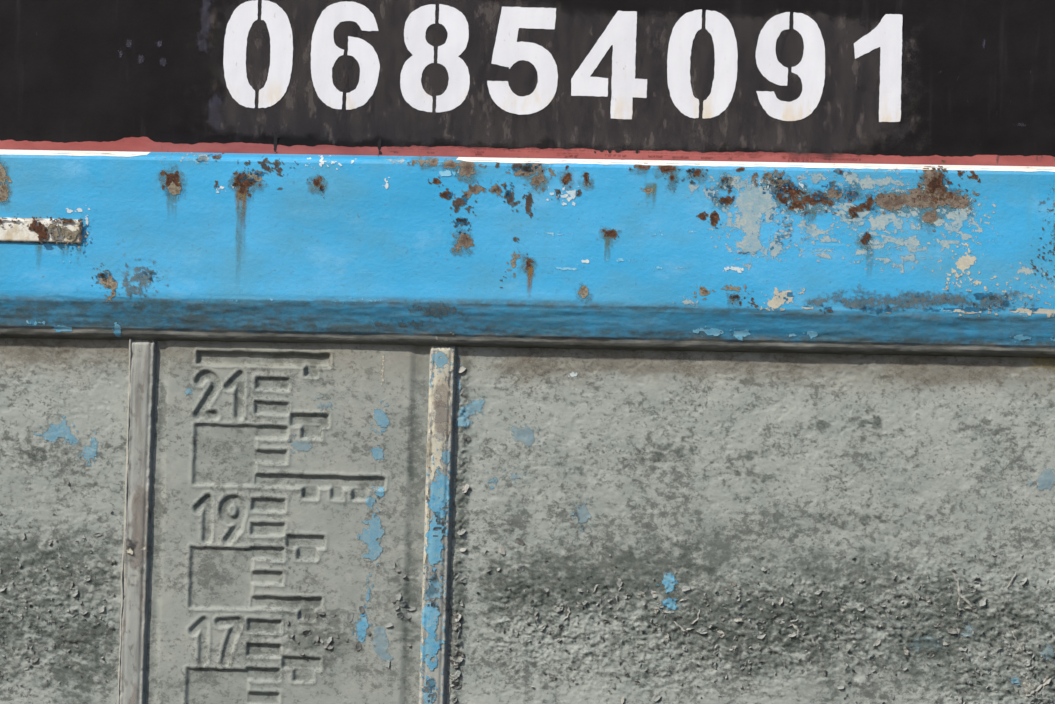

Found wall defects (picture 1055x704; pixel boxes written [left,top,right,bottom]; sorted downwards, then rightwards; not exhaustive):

corrosion [0,214,87,251]
corrosion [159,170,183,195]
corrosion [216,155,354,209]
corrosion [407,156,593,255]
corrosion [500,237,535,288]
corrosion [601,229,619,248]
corrosion [628,163,708,194]
corrosion [696,160,980,231]
peeling [673,166,1055,317]
corrosion [1008,188,1055,307]
peeling [286,332,485,704]
peeling [492,554,1055,704]